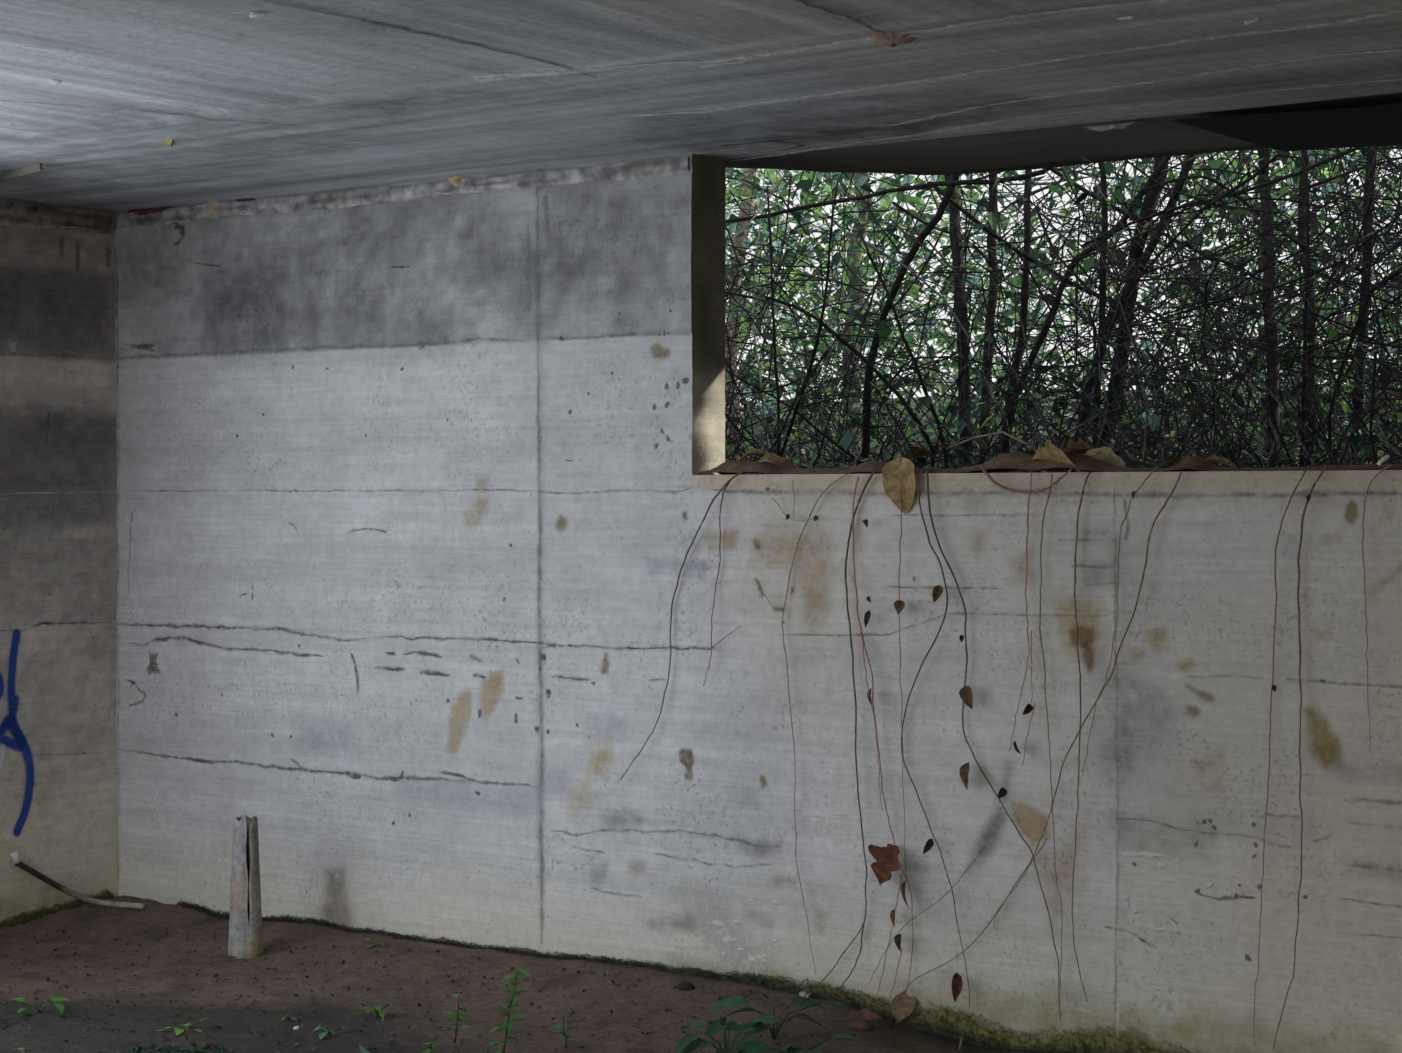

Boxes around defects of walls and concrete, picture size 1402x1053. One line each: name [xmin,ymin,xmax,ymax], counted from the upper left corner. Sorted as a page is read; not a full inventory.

crack [361,0,1176,78]
crack [634,11,1402,162]
corrosion [1070,622,1093,669]
corrosion [450,672,501,751]